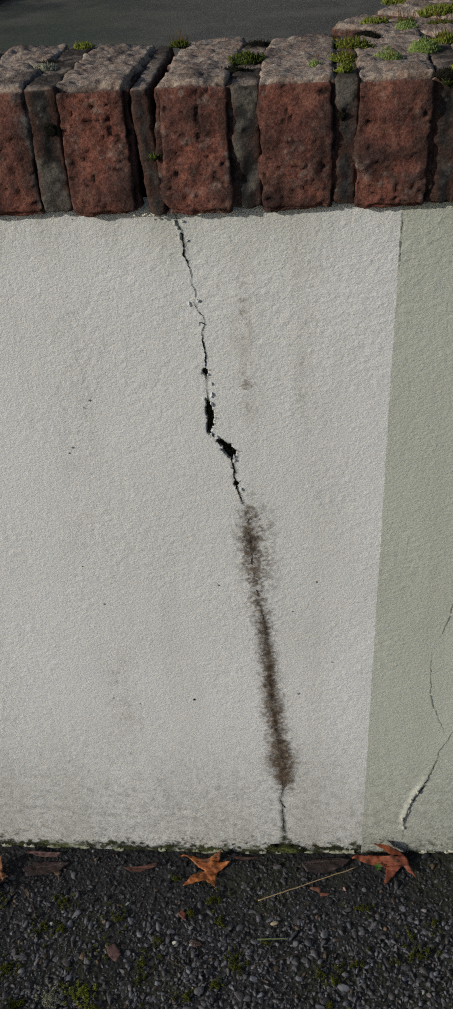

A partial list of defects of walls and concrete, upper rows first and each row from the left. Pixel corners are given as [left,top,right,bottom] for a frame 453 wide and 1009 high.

crack [173,215,265,624]
damp [242,507,293,790]